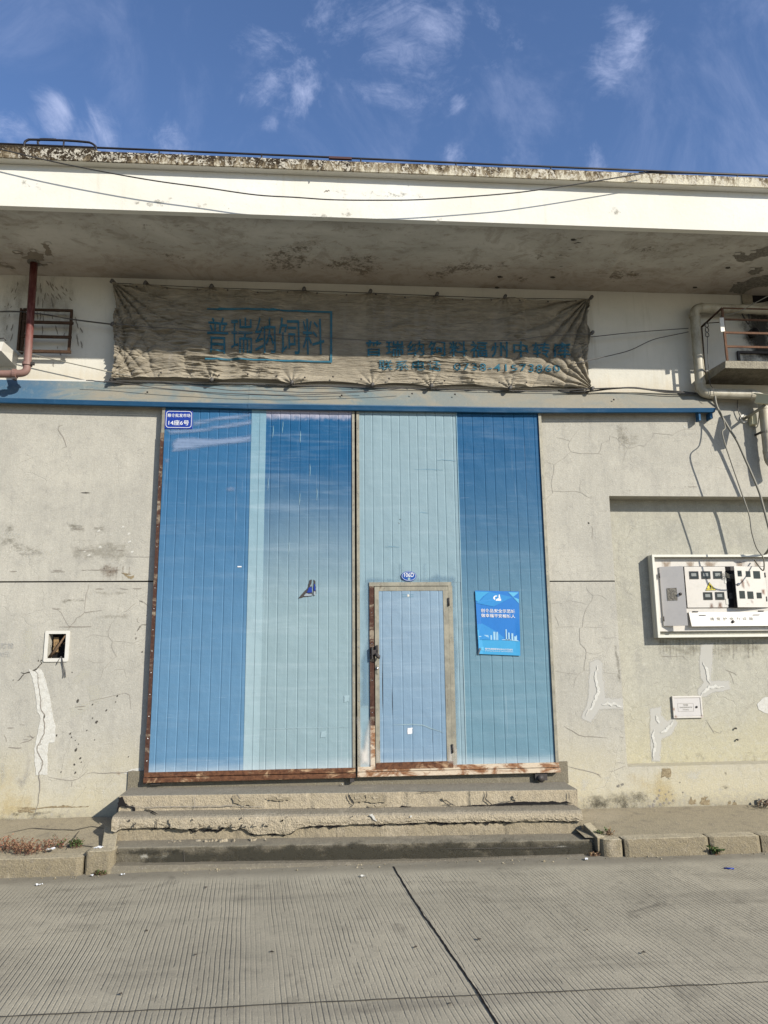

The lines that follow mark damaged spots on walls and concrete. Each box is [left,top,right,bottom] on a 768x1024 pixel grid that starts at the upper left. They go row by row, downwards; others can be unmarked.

crack [547,429,684,497]
crack [117,791,513,836]